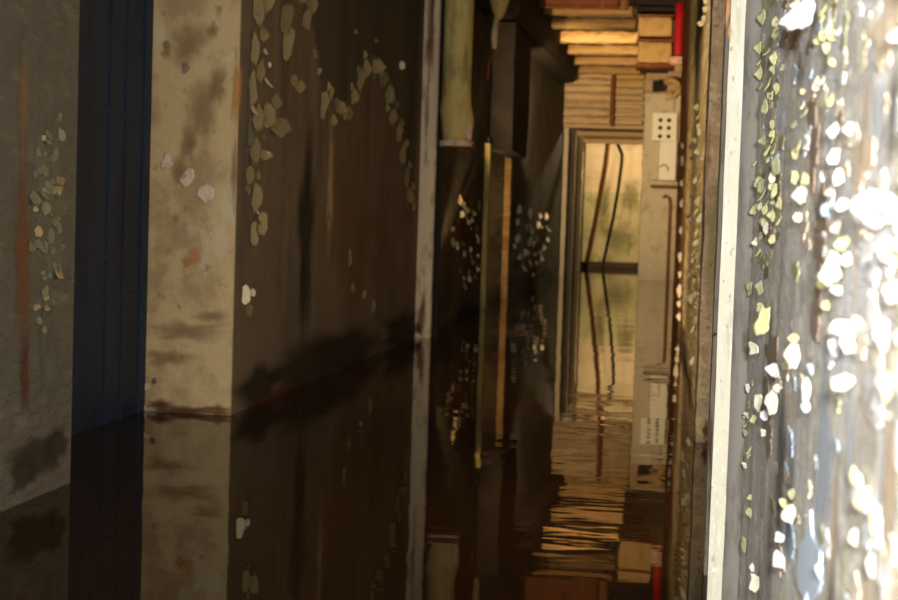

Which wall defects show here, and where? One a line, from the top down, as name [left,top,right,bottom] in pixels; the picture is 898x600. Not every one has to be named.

peeling [29,112,66,333]
peeling [178,167,215,204]
peeling [244,0,422,246]
peeling [742,0,898,600]